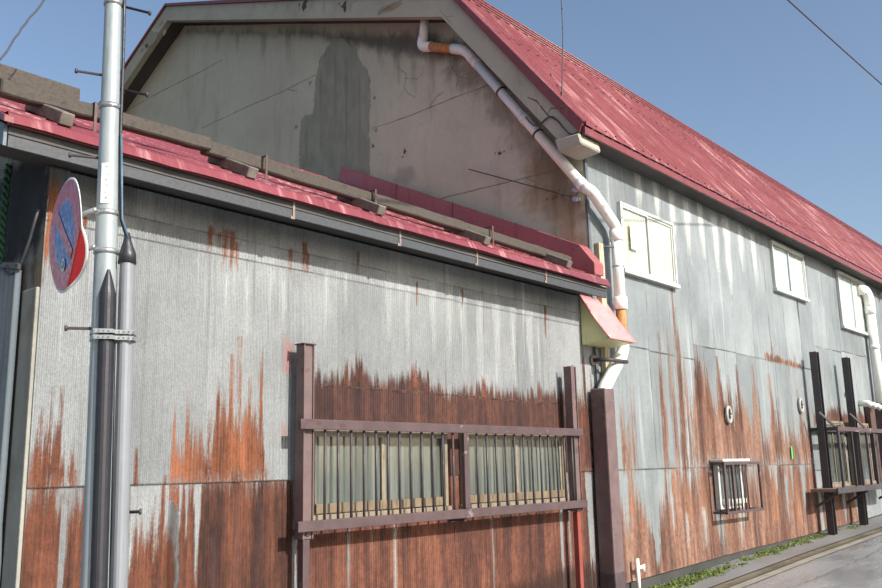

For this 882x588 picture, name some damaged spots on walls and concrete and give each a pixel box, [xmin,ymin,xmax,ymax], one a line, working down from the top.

peeling [295,38,377,180]
water stain [328,34,452,56]
corrosion [44,174,60,259]
corrosion [208,226,239,263]
corrosion [289,242,309,269]
corrosion [20,394,84,588]
corrosion [128,363,297,588]
corrosion [308,353,599,588]
corrosion [620,288,868,583]